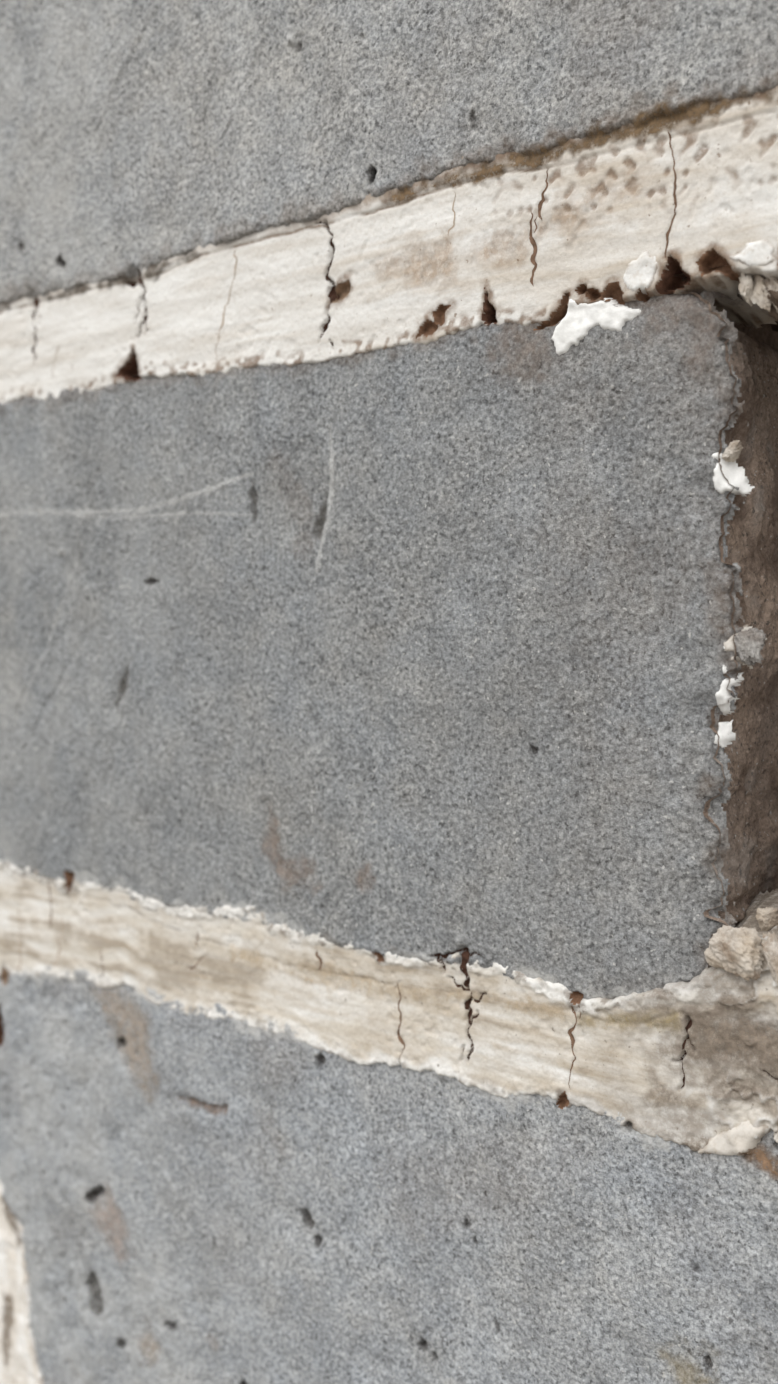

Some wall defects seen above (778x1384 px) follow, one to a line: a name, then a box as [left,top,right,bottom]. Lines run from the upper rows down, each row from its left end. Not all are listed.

crack [529,168,549,287]
crack [665,132,677,258]
crack [127,269,148,338]
crack [318,221,340,347]
spalling [432,304,451,326]
peeling [551,250,658,355]
peeling [729,240,778,313]
peeling [761,932,778,986]
crack [430,947,487,1060]
crack [568,1006,581,1088]
crack [676,1019,695,1088]
peeling [698,1120,778,1156]